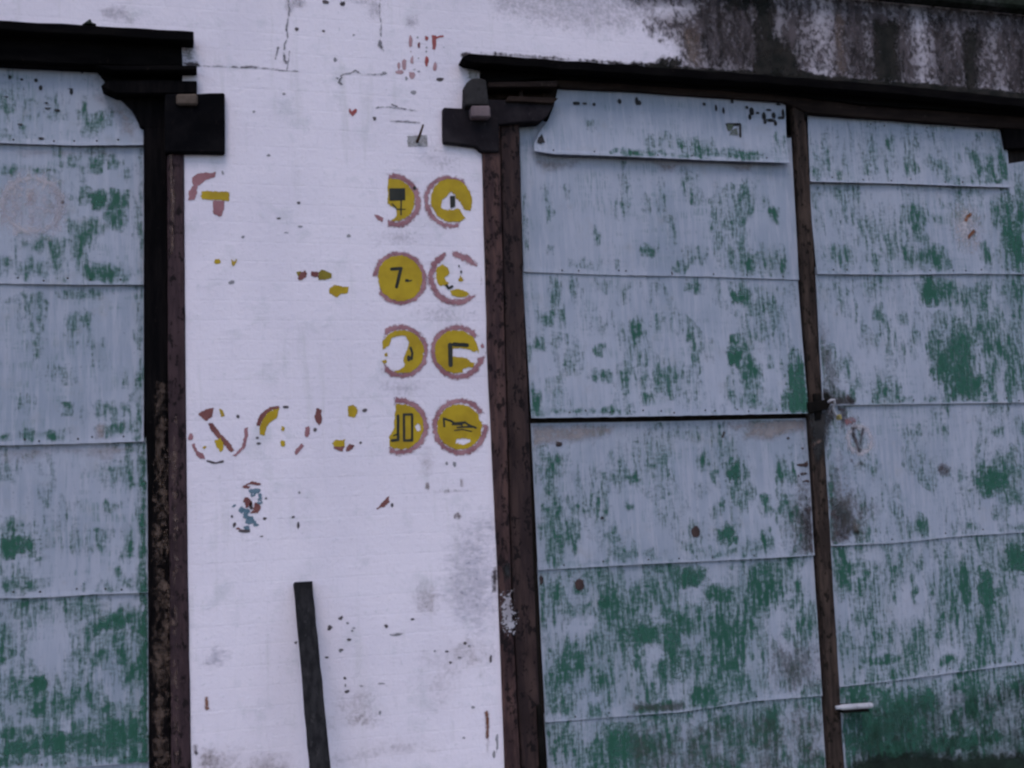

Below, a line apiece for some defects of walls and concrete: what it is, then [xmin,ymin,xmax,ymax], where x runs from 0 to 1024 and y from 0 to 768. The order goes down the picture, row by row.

crack [336,70,384,85]
damp [631,0,1024,94]
peeling [4,148,143,311]
peeling [672,182,808,424]
peeling [555,313,704,415]
peeling [188,406,322,464]
peeling [332,439,362,452]
peeling [812,125,1024,768]
peeling [0,330,179,768]
peeling [231,481,267,537]
peeling [499,590,519,634]
peeling [538,422,825,768]